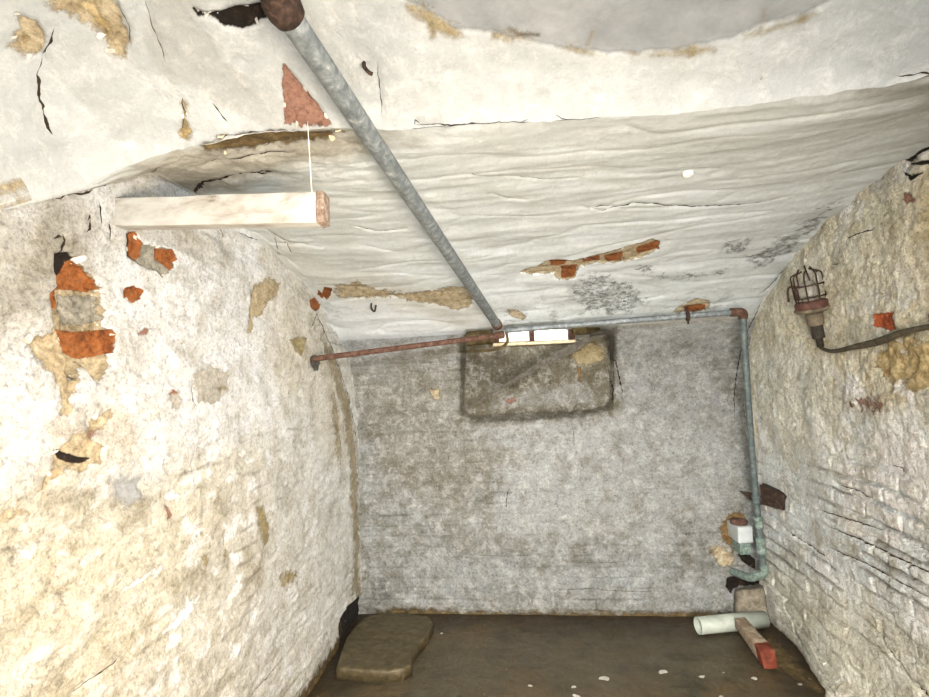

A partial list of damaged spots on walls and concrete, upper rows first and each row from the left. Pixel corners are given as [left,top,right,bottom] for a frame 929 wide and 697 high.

crack [36,30,54,134]
peeling [178,100,192,139]
spalling [200,64,345,155]
crack [903,160,929,180]
spalling [24,252,117,416]
spalling [247,277,279,333]
spalling [309,287,332,311]
peeling [394,286,473,310]
spalling [519,239,660,280]
spalling [873,312,929,394]
peeling [41,409,113,490]
crack [787,509,929,597]